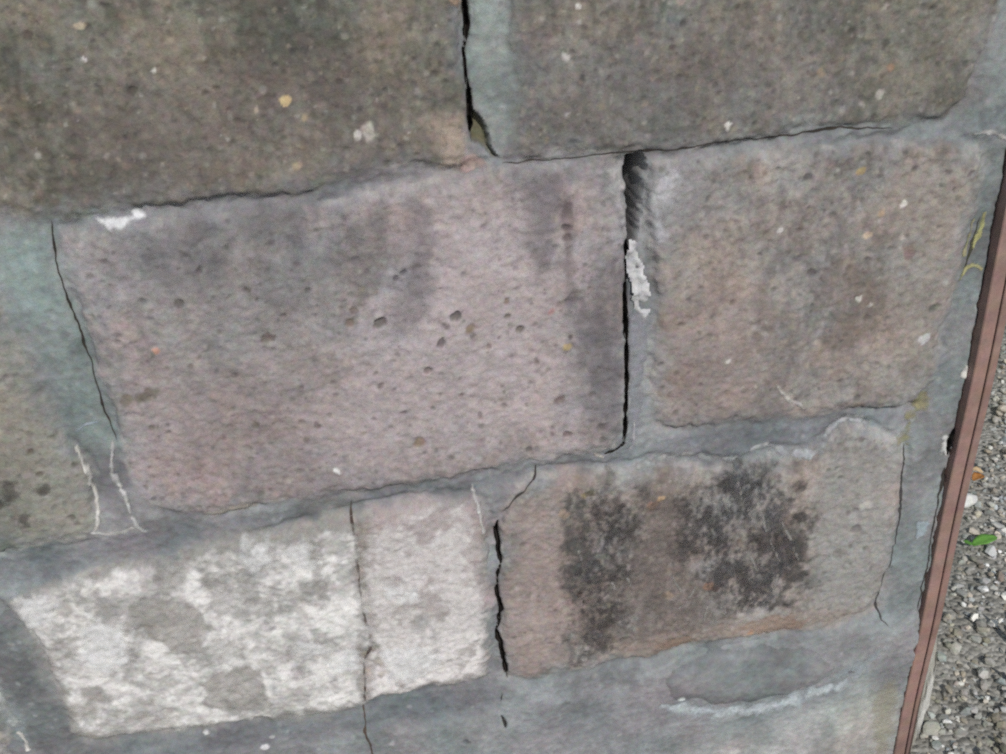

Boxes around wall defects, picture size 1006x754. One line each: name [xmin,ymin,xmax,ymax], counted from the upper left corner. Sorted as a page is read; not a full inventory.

crack [462,0,473,132]
crack [52,224,117,440]
crack [605,239,629,454]
crack [349,500,373,754]
crack [494,465,536,726]
leakage [562,500,591,602]
leakage [765,512,811,610]